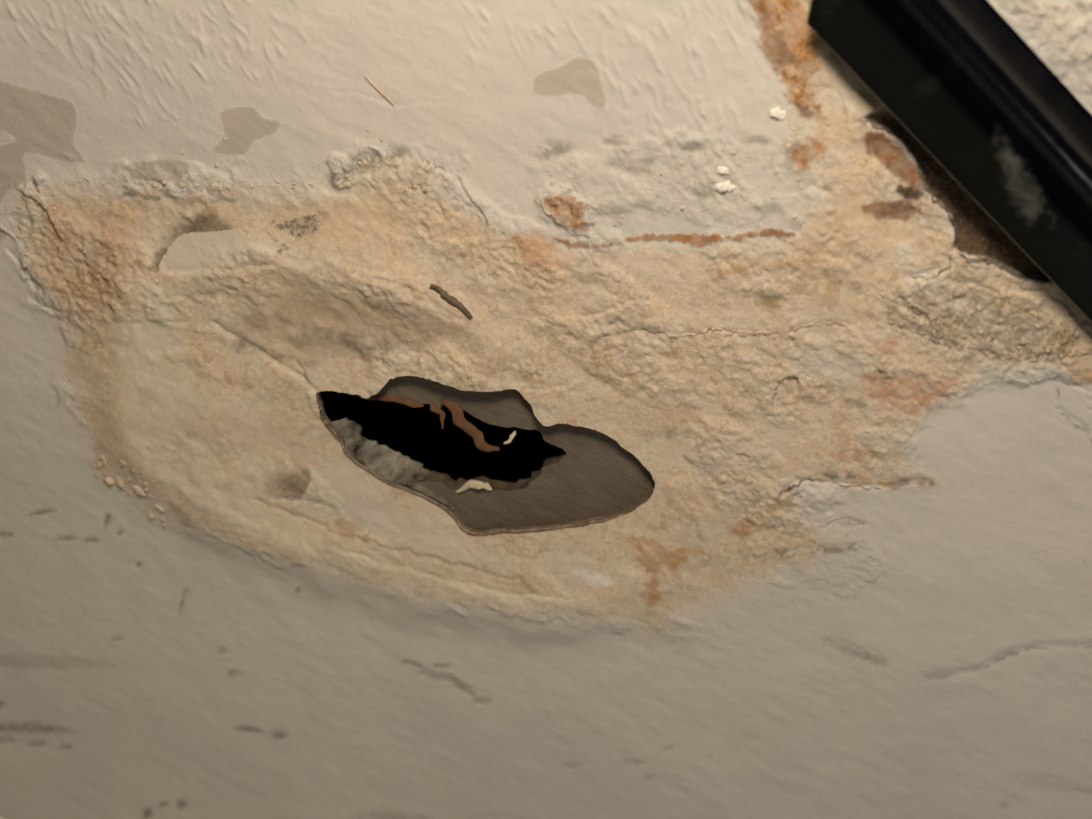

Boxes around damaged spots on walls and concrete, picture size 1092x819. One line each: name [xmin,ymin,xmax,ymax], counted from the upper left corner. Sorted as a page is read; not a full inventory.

corrosion [749,0,826,121]
corrosion [543,195,795,248]
spalling [696,165,736,197]
corrosion [791,134,826,170]
corrosion [861,130,923,221]
spalling [859,109,1049,355]
damp [31,0,1092,632]
crack [616,320,850,338]